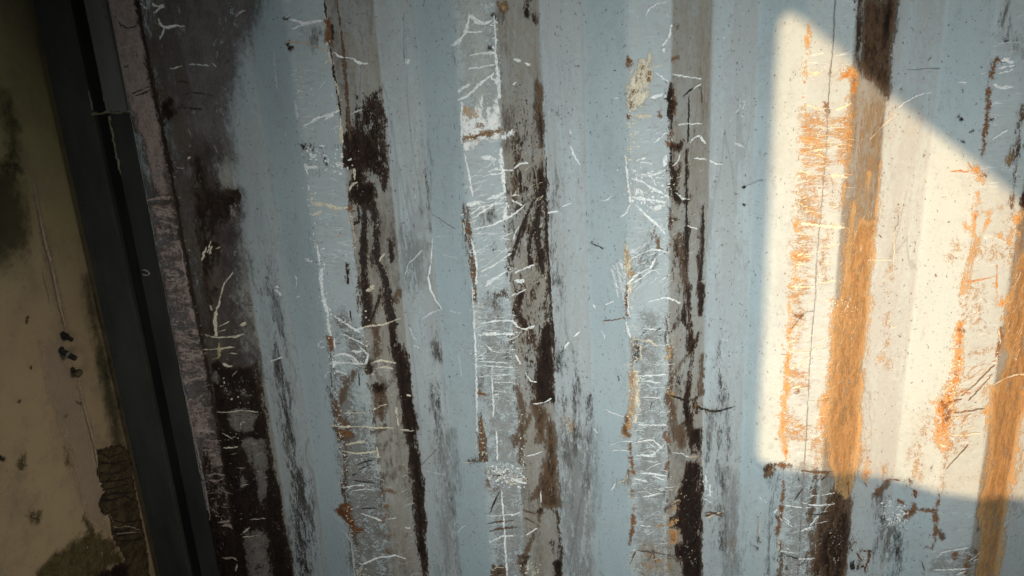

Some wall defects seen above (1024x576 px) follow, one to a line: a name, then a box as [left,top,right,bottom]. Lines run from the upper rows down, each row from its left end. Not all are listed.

corrosion [182,146,294,576]
corrosion [311,0,430,576]
corrosion [462,75,563,576]
peeling [617,24,678,545]
corrosion [617,132,723,576]
corrosion [760,0,1024,576]